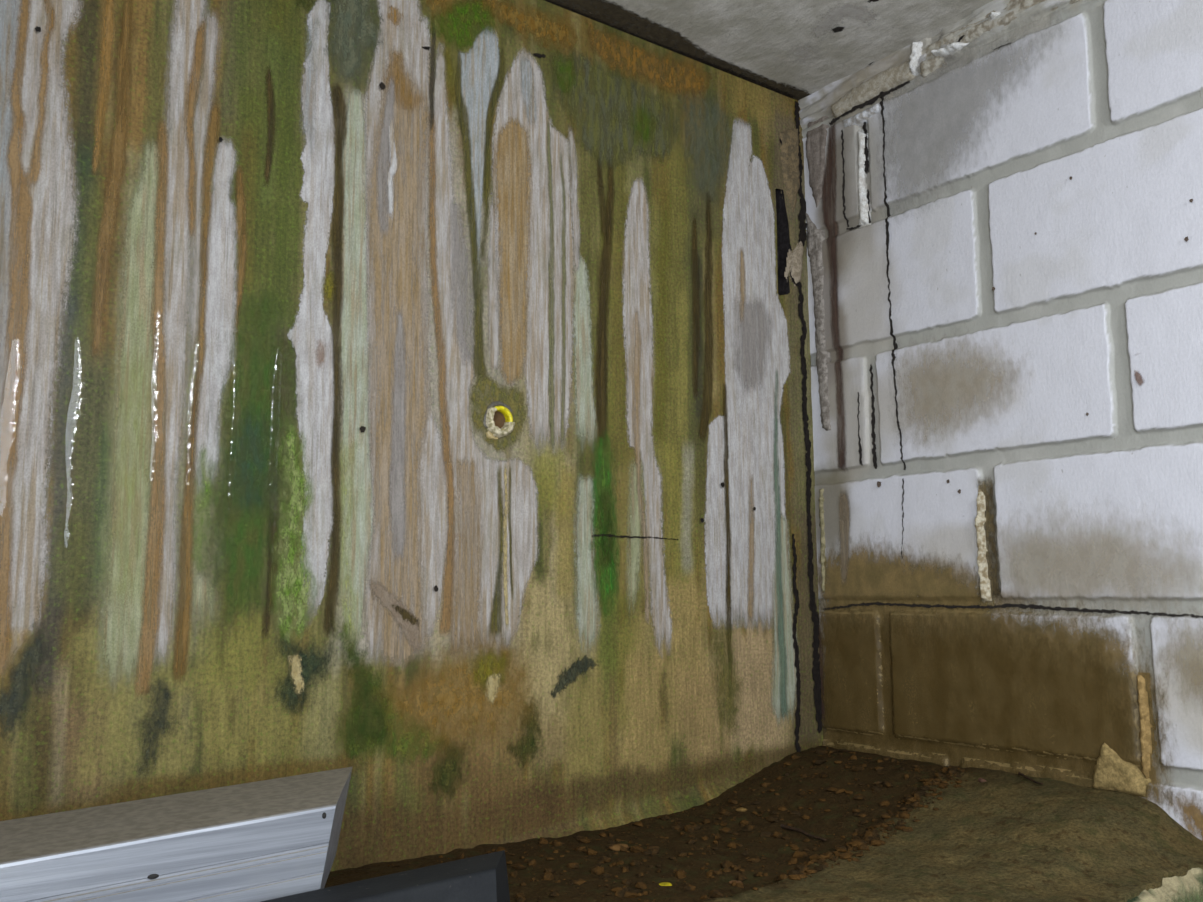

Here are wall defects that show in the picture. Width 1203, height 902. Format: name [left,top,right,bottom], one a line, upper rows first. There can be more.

damp [0,0,81,674]
damp [100,0,237,692]
damp [274,0,599,665]
damp [622,179,672,649]
damp [544,0,811,101]
damp [704,121,797,718]
peeling [843,102,881,228]
crack [780,81,1203,752]
peeling [909,0,1079,78]
damp [817,546,1168,803]
damp [1168,632,1203,694]